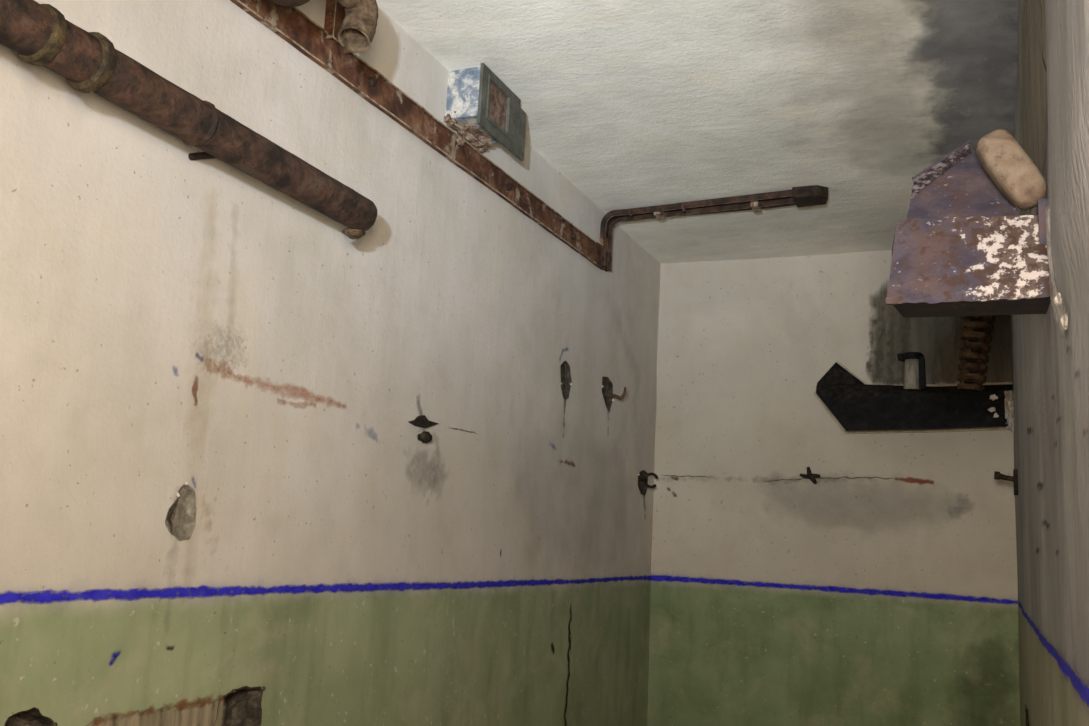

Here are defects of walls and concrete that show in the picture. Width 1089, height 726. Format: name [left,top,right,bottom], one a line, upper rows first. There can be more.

spalling [165,481,197,541]
crack [564,606,572,726]
flaking render [87,686,266,726]